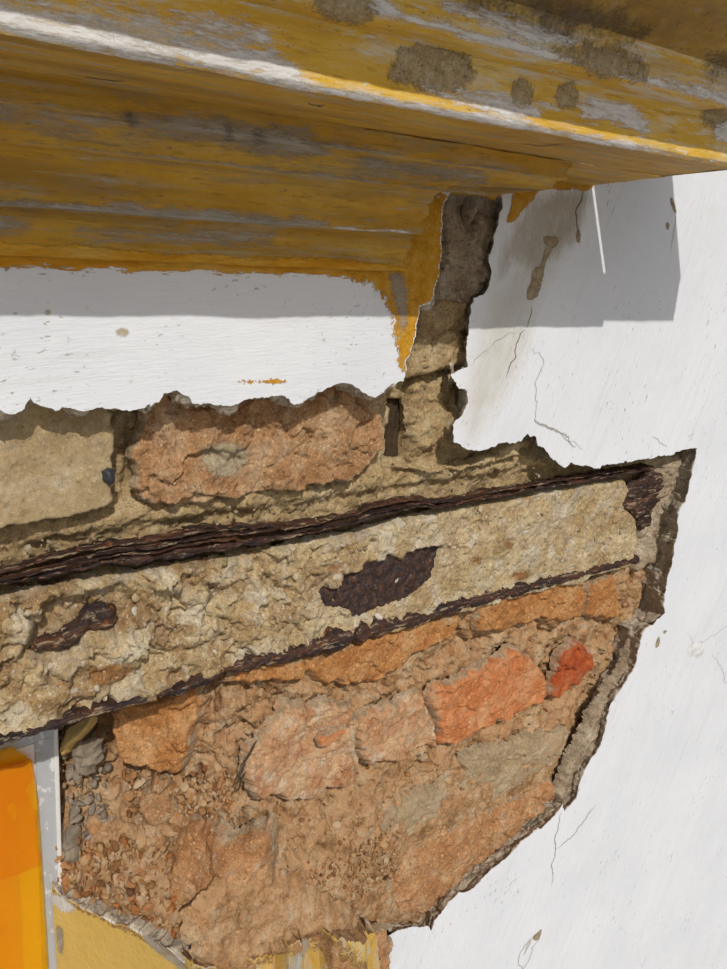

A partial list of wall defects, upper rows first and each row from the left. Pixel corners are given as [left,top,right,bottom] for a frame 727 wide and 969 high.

peeling [0,0,308,91]
crack [575,193,583,243]
spalling [137,390,319,416]
spalling [333,195,560,474]
crack [469,307,582,449]
rust [0,468,626,582]
rust [622,470,664,530]
rust [318,546,438,617]
rust [30,600,118,652]
spalling [364,448,697,969]
spalling [51,882,194,969]
crack [518,930,541,969]